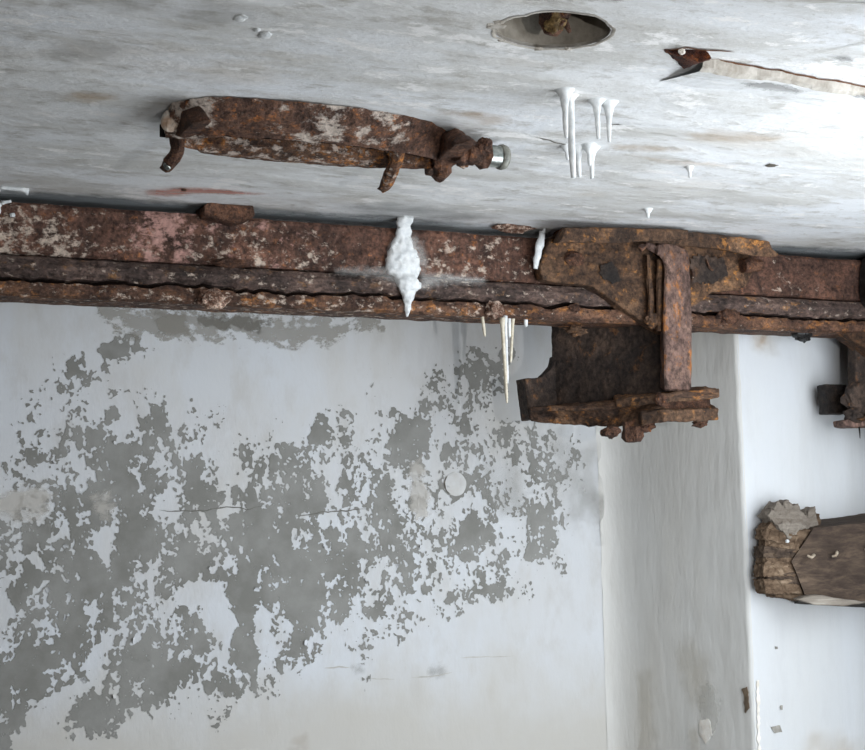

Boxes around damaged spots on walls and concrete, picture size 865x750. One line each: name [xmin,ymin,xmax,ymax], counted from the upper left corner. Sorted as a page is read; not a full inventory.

spalling [486,11,616,51]
crack [660,43,865,107]
rust [0,279,403,300]
rust [742,314,865,322]
peeling [0,333,586,750]
spalling [742,680,761,750]